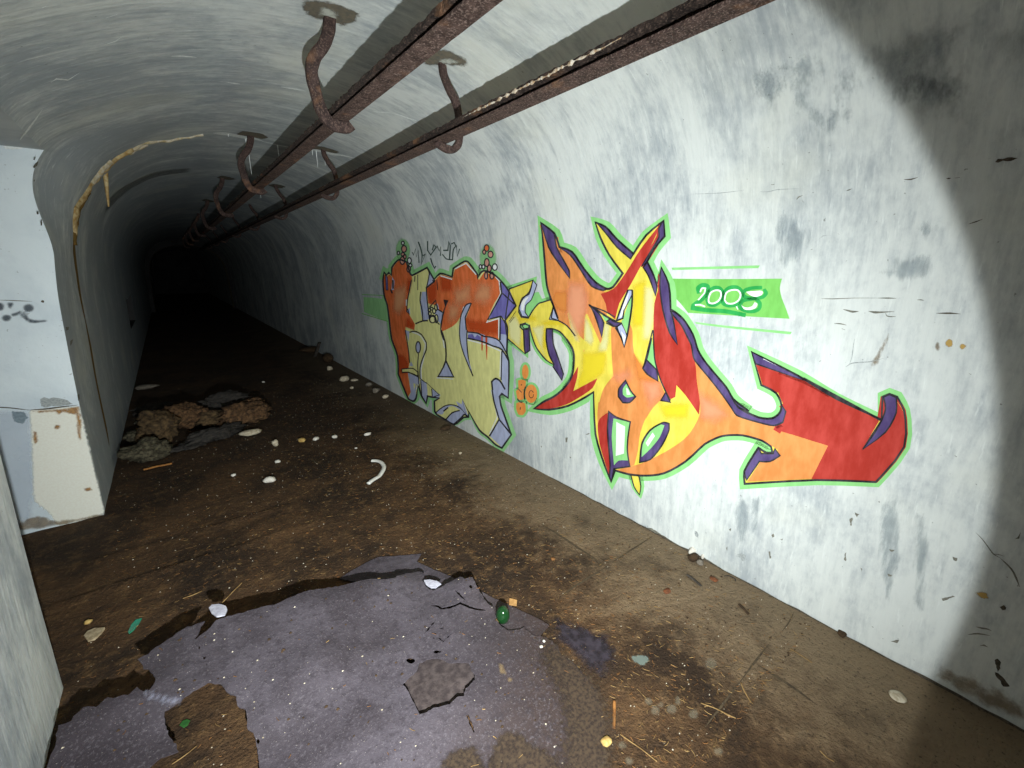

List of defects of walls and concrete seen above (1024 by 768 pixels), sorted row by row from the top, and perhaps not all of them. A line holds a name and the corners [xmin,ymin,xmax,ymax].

peeling [40,394,80,407]
peeling [12,411,28,424]